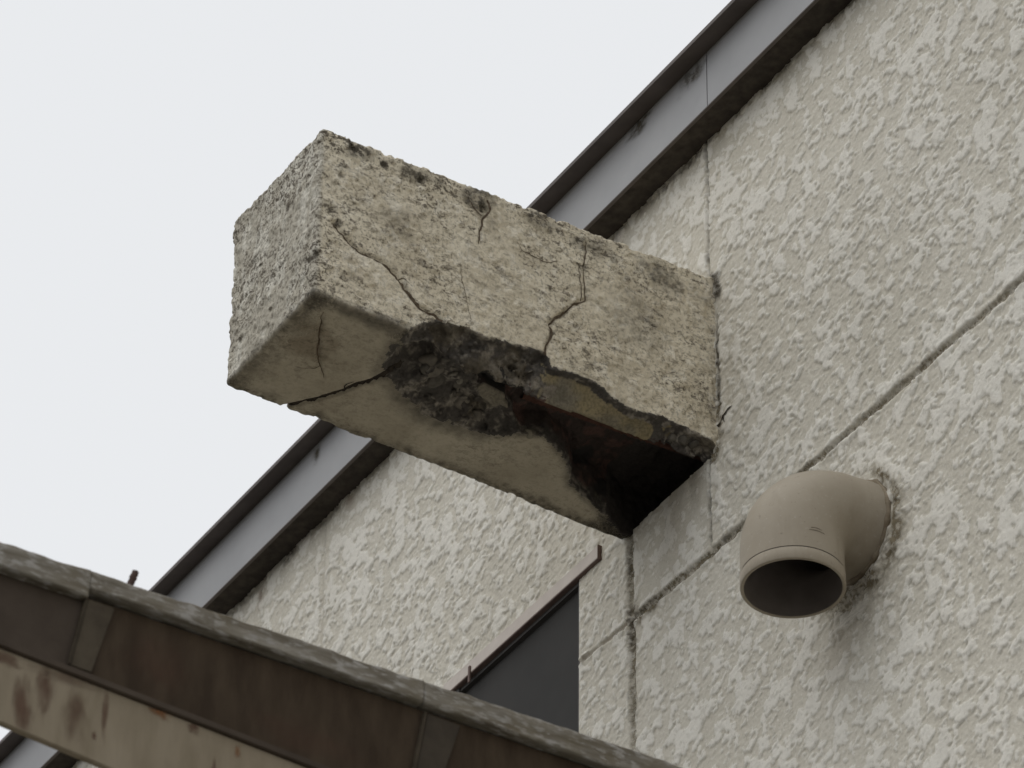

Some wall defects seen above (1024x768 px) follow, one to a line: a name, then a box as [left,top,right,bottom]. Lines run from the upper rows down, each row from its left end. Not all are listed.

crack [468,196,491,243]
crack [333,224,443,322]
crack [517,242,587,355]
crack [288,312,404,405]
spalling [381,319,716,537]